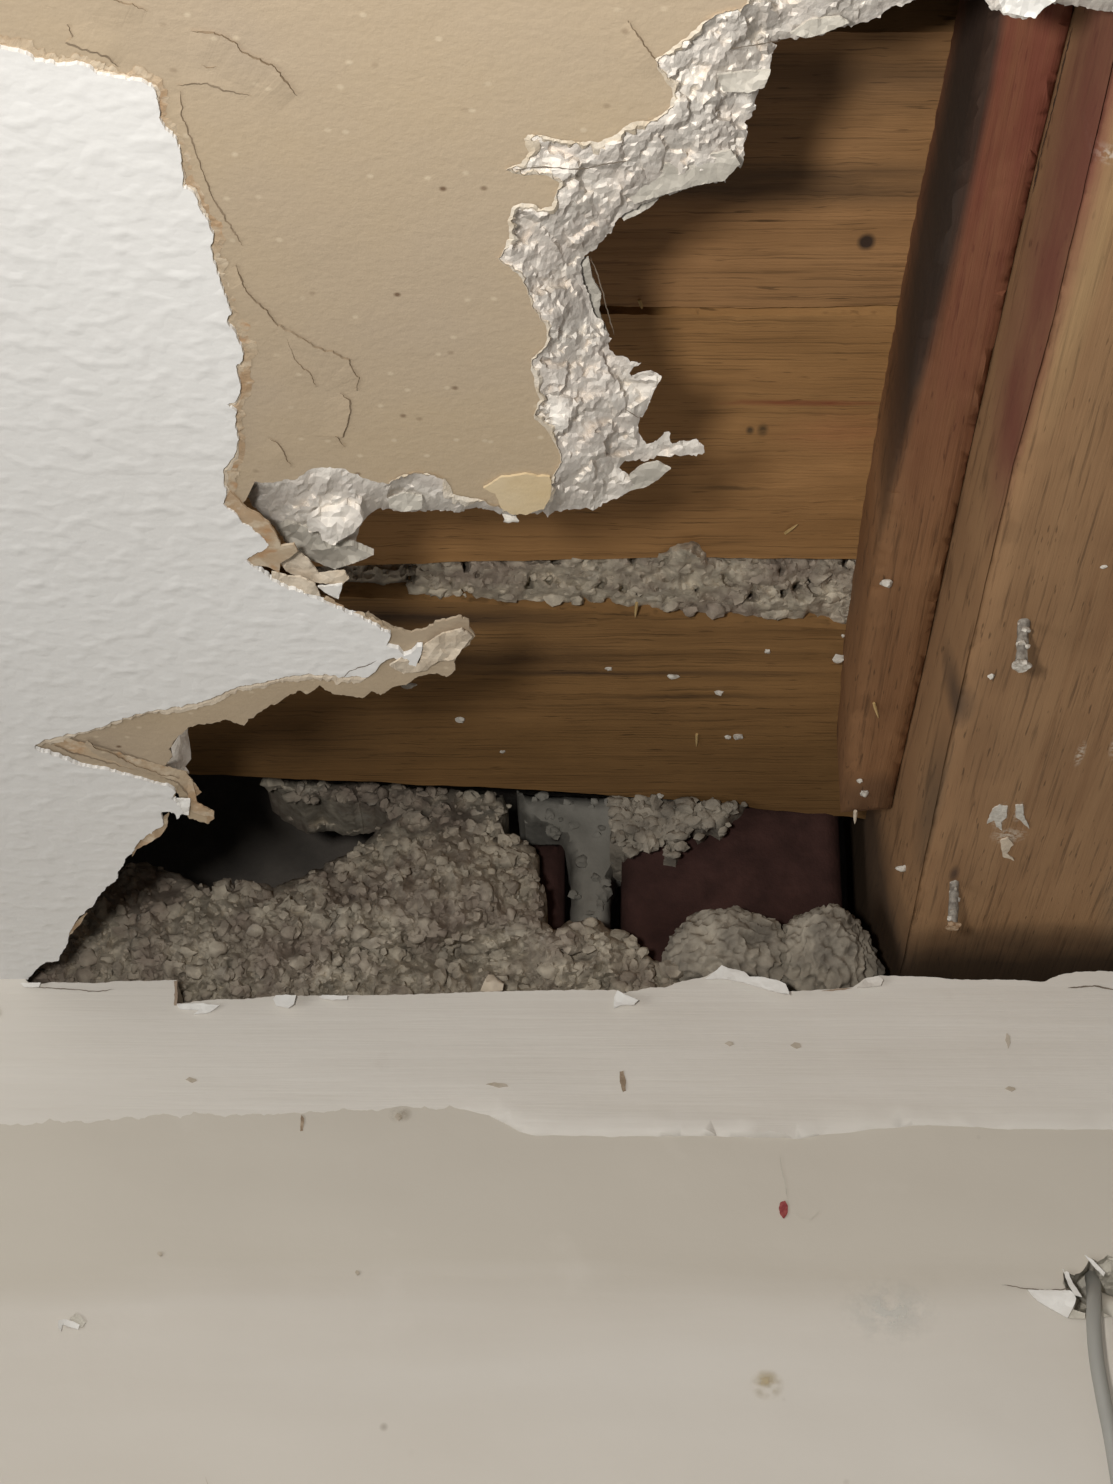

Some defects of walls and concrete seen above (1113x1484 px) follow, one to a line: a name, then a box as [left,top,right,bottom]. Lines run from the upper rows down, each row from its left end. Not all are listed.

spalling [985,0,1113,20]
peeling [0,0,912,570]
peeling [36,611,475,889]
spalling [375,781,609,837]
spalling [838,816,848,910]
spalling [611,886,620,930]
peeling [706,965,789,994]
peeling [857,976,883,988]
peeling [177,1003,220,1015]
peeling [273,994,296,1008]
peeling [614,990,638,1008]
peeling [1028,1289,1076,1318]